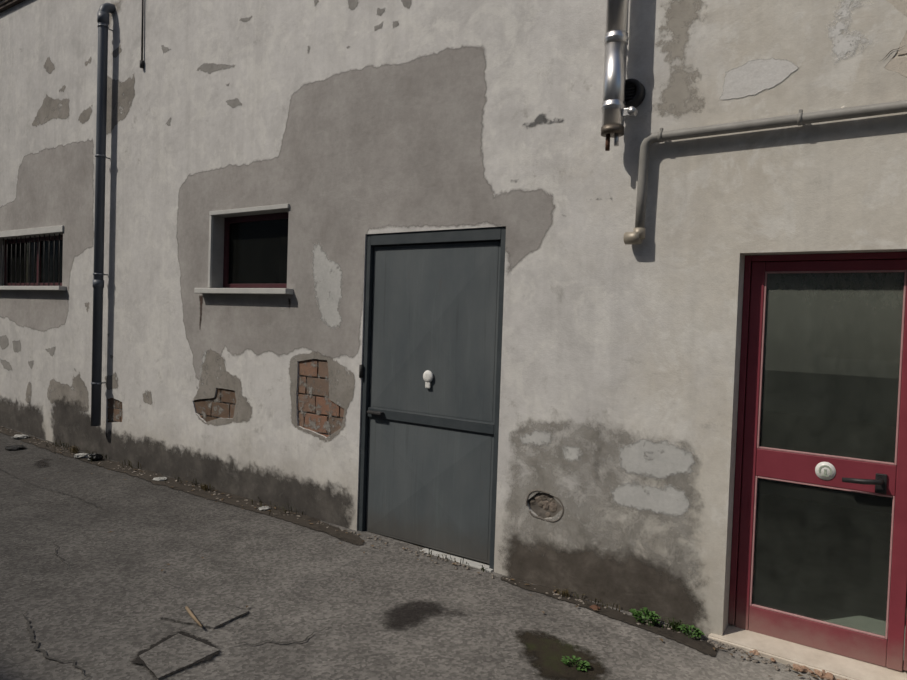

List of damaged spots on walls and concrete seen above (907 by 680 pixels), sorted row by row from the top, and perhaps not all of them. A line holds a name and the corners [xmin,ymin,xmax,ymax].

peeling [374,8,399,30]
peeling [44,58,55,74]
peeling [32,85,92,127]
peeling [106,74,135,134]
peeling [0,140,94,332]
peeling [176,46,555,442]
peeling [0,335,21,352]
peeling [47,369,89,412]
flaking render [105,372,123,422]
water stain [0,397,353,528]
peeling [500,420,700,586]
water stain [505,537,705,631]